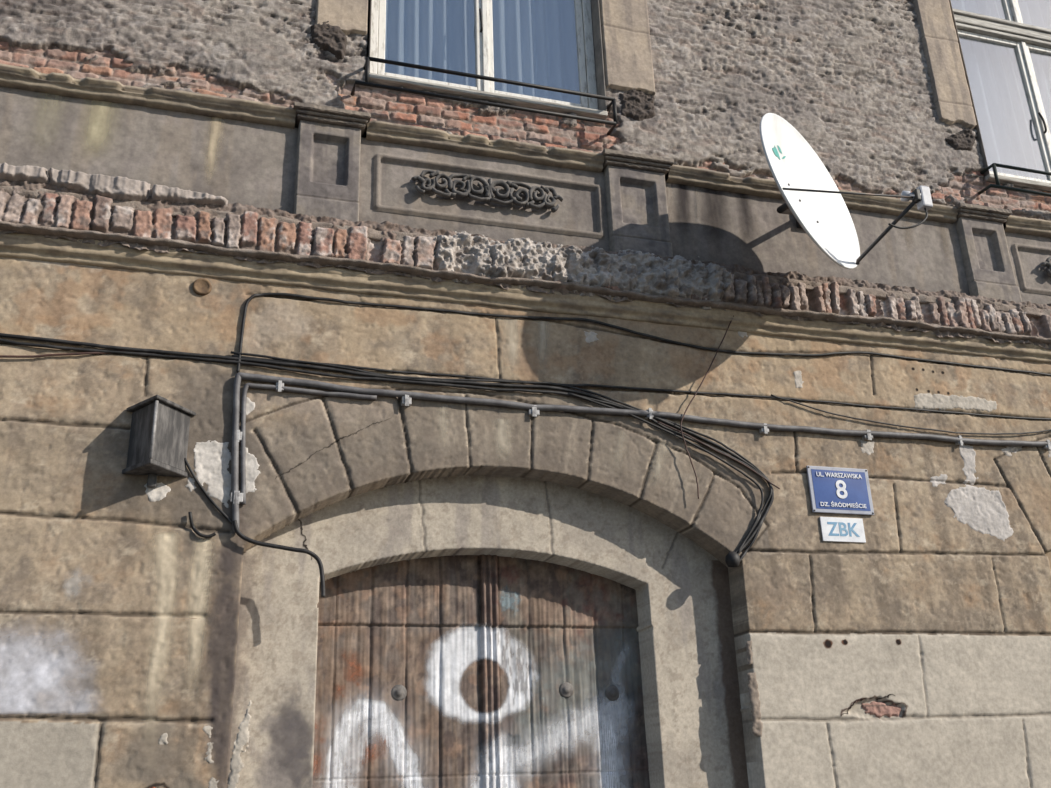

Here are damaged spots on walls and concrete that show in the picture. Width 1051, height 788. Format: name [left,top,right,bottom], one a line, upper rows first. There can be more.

spalling [310,21,347,60]
flaking render [0,41,299,108]
spalling [945,129,975,151]
flaking render [833,176,898,198]
peeling [794,370,804,388]
peeling [246,397,255,415]
crack [276,420,386,478]
peeling [860,440,874,455]
peeling [186,440,260,508]
peeling [144,482,171,502]
peeling [930,444,1014,541]
spalling [841,696,907,719]